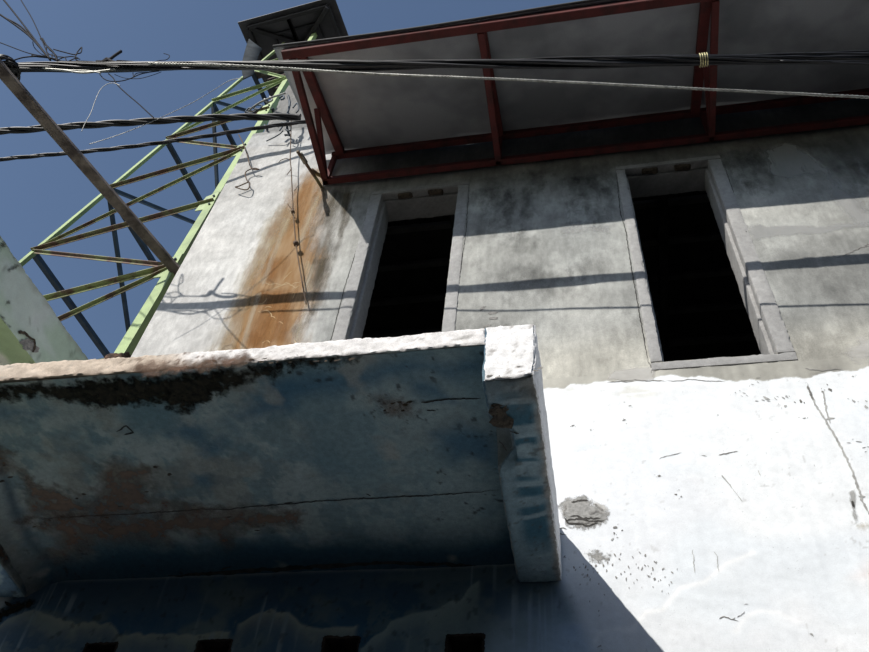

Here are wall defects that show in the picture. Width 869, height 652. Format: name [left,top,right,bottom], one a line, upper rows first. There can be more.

leakage [323,191,350,222]
corrosion [229,171,323,350]
leakage [316,243,330,281]
spalling [18,330,40,353]
leakage [0,355,360,415]
crack [421,398,481,411]
crack [806,368,869,519]
crack [24,490,493,520]
spalling [558,495,622,541]
peeling [573,550,673,594]